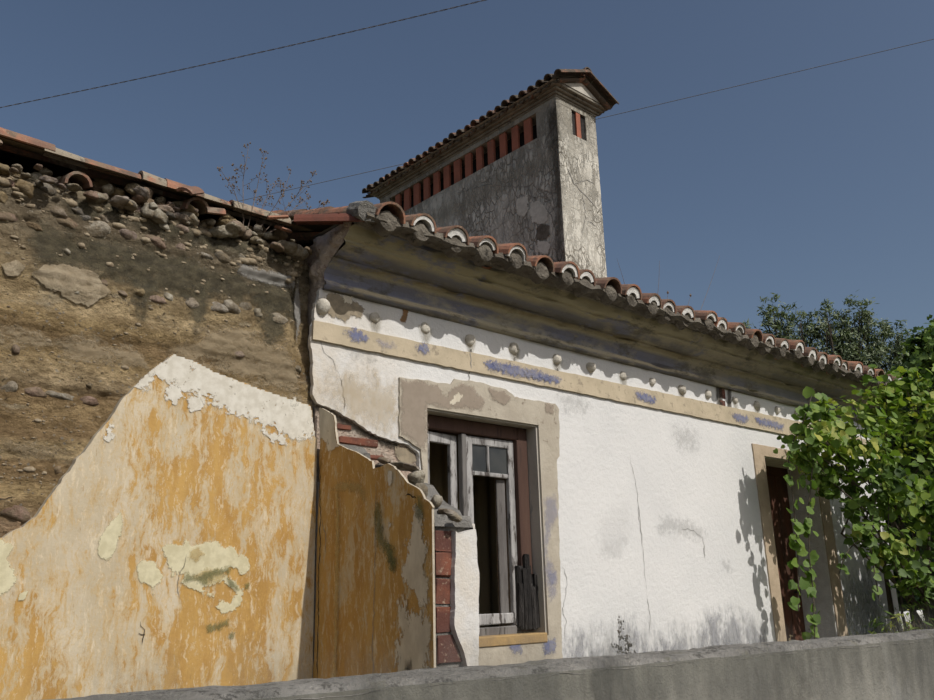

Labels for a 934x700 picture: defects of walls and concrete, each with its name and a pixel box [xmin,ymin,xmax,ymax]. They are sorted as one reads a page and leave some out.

crack [458,165,598,252]
flaking render [3,260,111,307]
peeling [0,325,510,464]
peeling [0,540,28,600]
peeling [98,512,123,560]
peeling [137,540,250,614]
peeling [392,504,432,672]